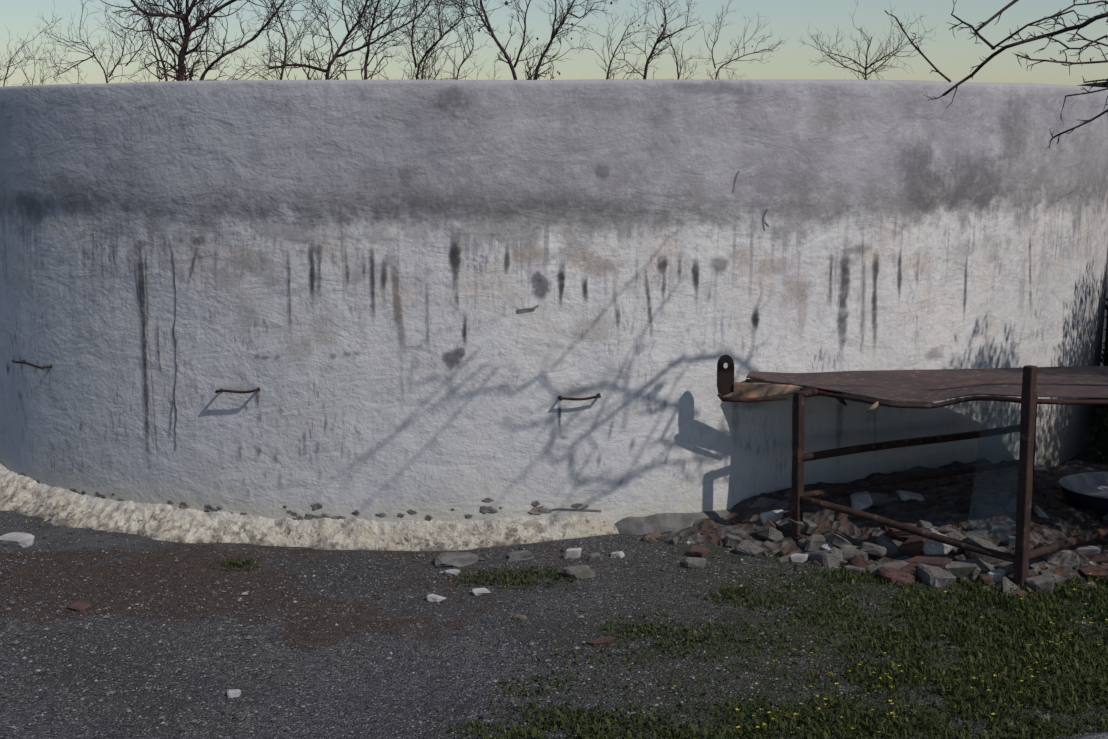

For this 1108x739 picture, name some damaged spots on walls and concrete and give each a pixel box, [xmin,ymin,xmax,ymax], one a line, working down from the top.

water stain [310,253,321,291]
water stain [370,255,387,308]
water stain [450,244,461,277]
water stain [830,263,849,331]
water stain [134,258,161,438]